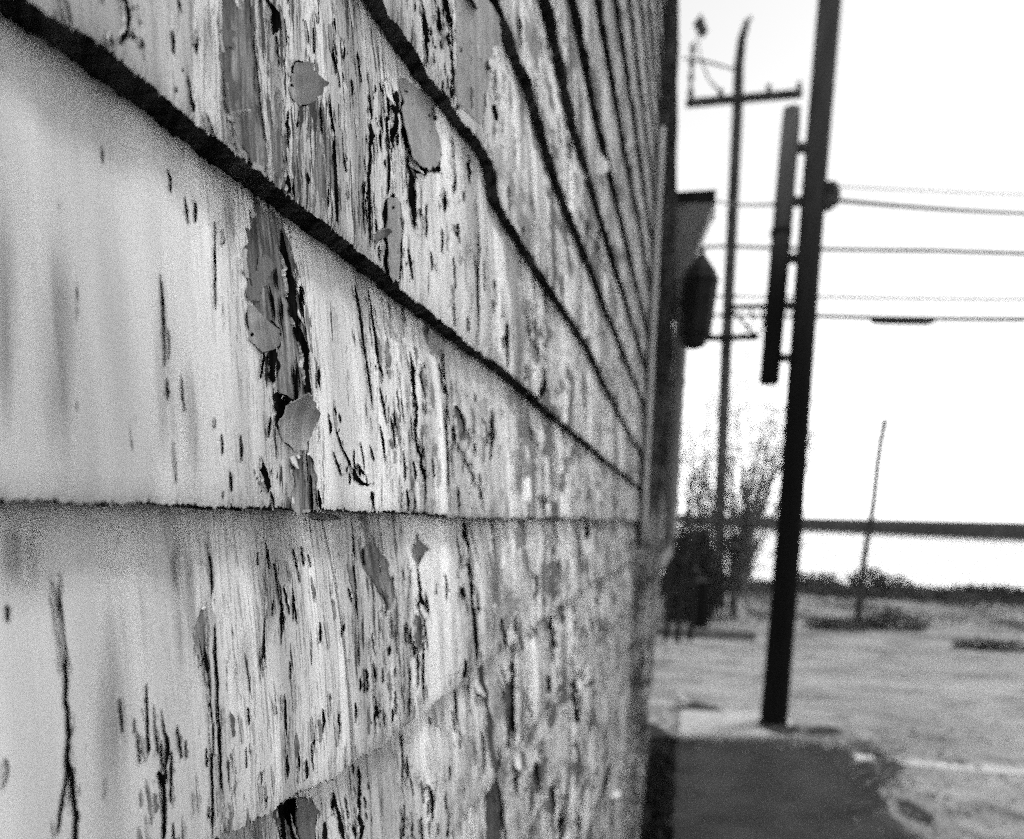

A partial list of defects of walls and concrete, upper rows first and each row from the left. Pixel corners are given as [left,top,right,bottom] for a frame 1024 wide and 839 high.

peeling [276,0,348,166]
peeling [343,53,442,284]
peeling [242,202,341,521]
peeling [172,587,250,839]
peeling [259,767,321,839]
peeling [274,546,316,624]
peeling [295,693,339,770]
peeling [347,533,430,616]
peeling [365,668,437,743]
peeling [406,603,431,679]
peeling [452,643,551,839]
peeling [515,413,601,685]